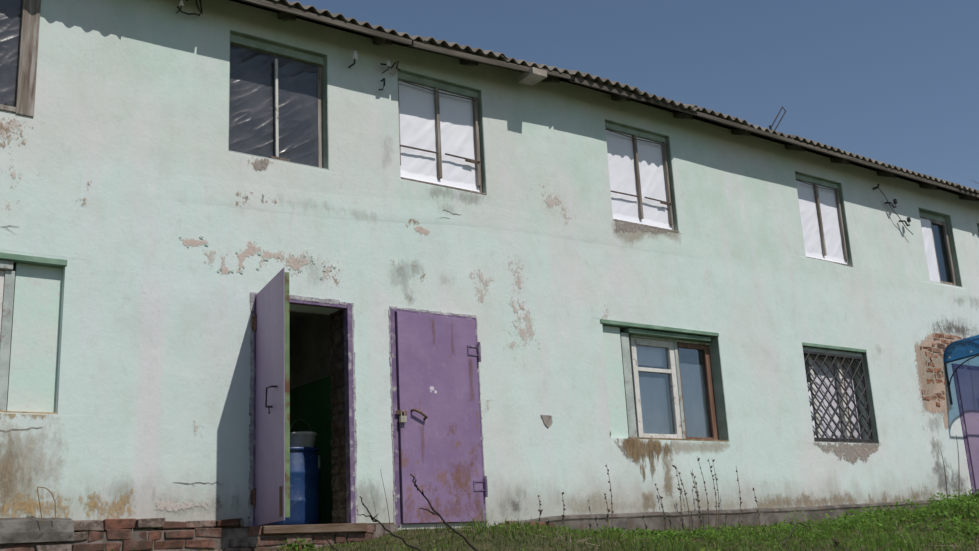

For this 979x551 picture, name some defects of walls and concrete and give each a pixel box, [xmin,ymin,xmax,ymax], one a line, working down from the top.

peeling [0,117,33,148]
peeling [179,236,340,284]
peeling [509,261,540,349]
spalling [915,332,970,429]
water stain [0,435,43,501]